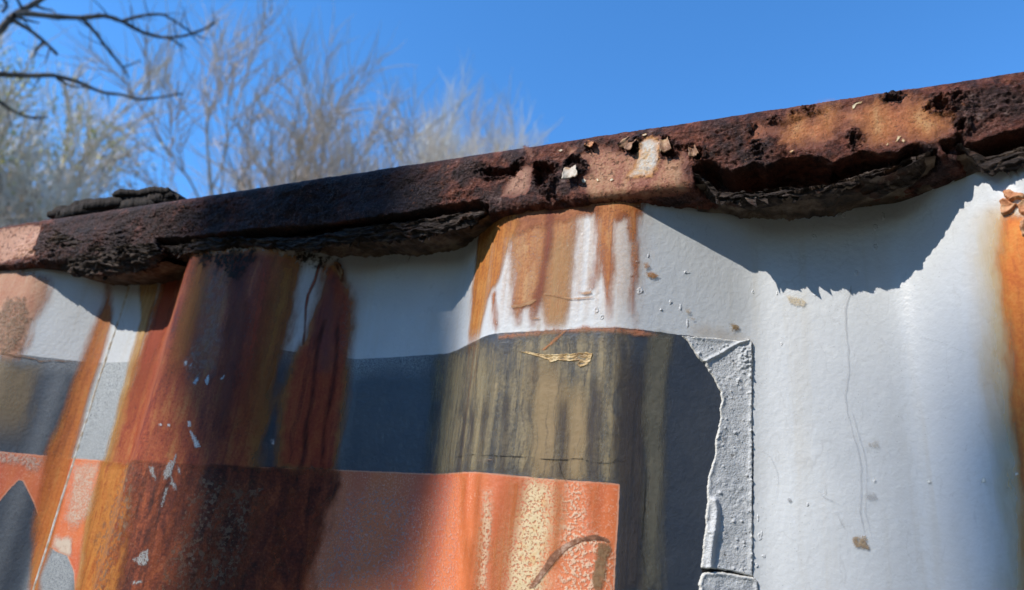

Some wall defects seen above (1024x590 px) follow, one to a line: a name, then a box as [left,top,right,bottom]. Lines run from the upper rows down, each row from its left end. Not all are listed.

peeling [561,165,578,179]
peeling [618,136,637,150]
peeling [659,137,671,153]
rust [693,148,936,221]
rust [954,143,1024,182]
rust [0,270,48,359]
rust [30,174,655,590]
spalling [518,332,593,367]
rust [991,189,1024,589]
peeling [682,324,759,590]